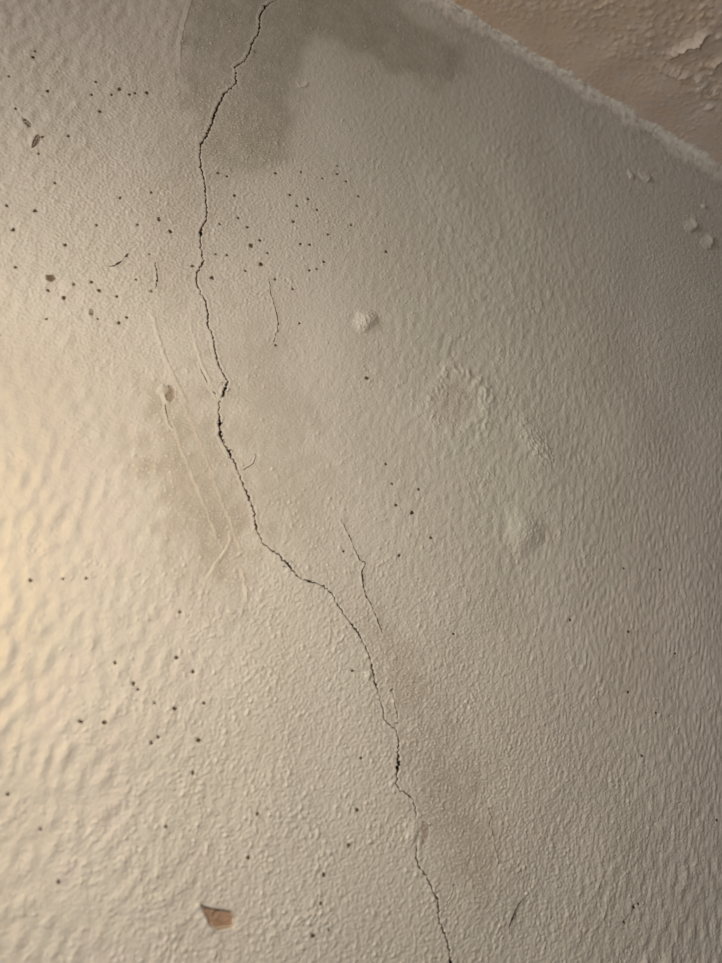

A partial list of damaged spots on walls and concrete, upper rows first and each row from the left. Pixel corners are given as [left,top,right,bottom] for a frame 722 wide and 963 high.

peeling [665,27,713,61]
crack [191,0,457,963]
peeling [192,902,235,939]